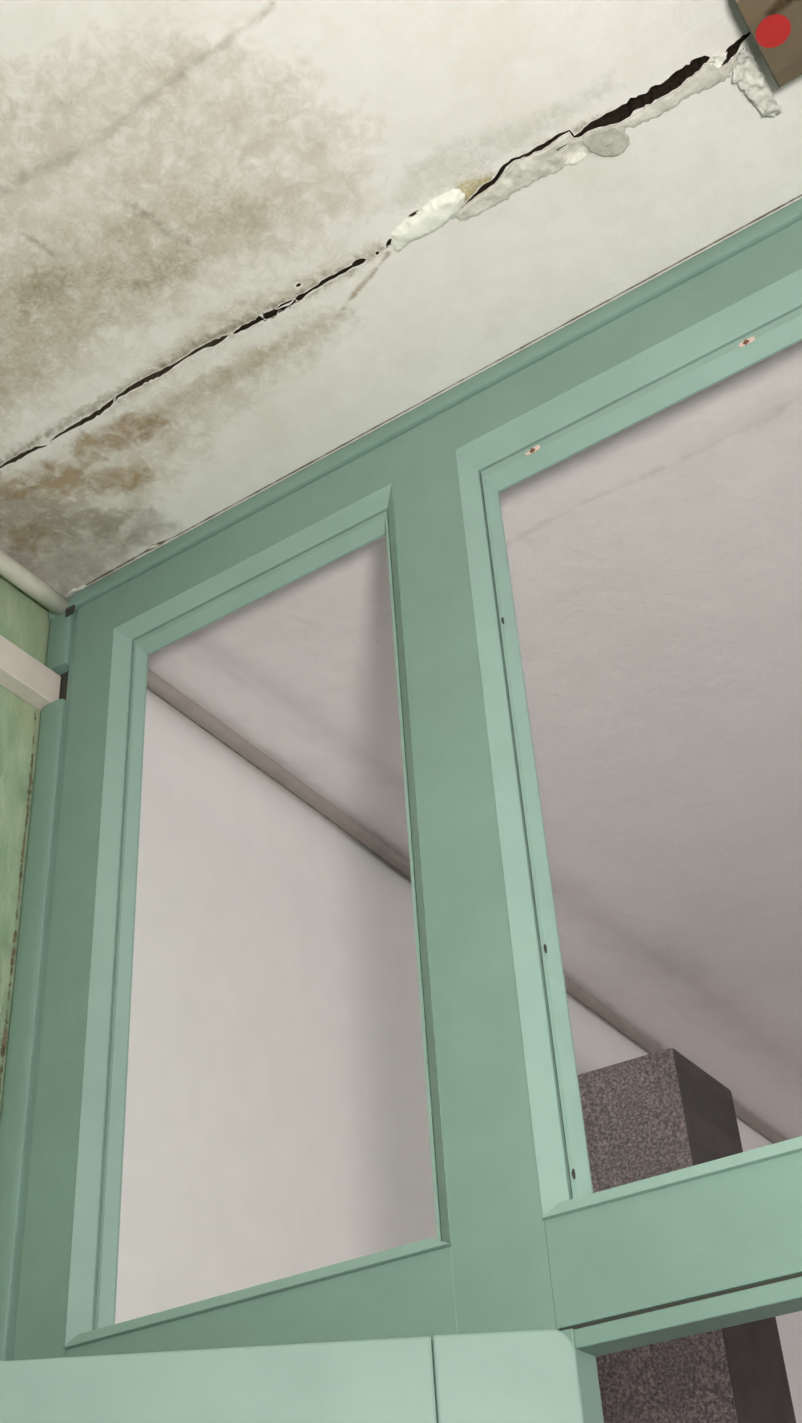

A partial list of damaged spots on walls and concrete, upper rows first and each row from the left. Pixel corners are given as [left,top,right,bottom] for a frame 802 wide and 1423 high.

crack [462,32,750,207]
spalling [454,46,782,220]
crack [0,210,418,468]
crack [86,194,802,585]